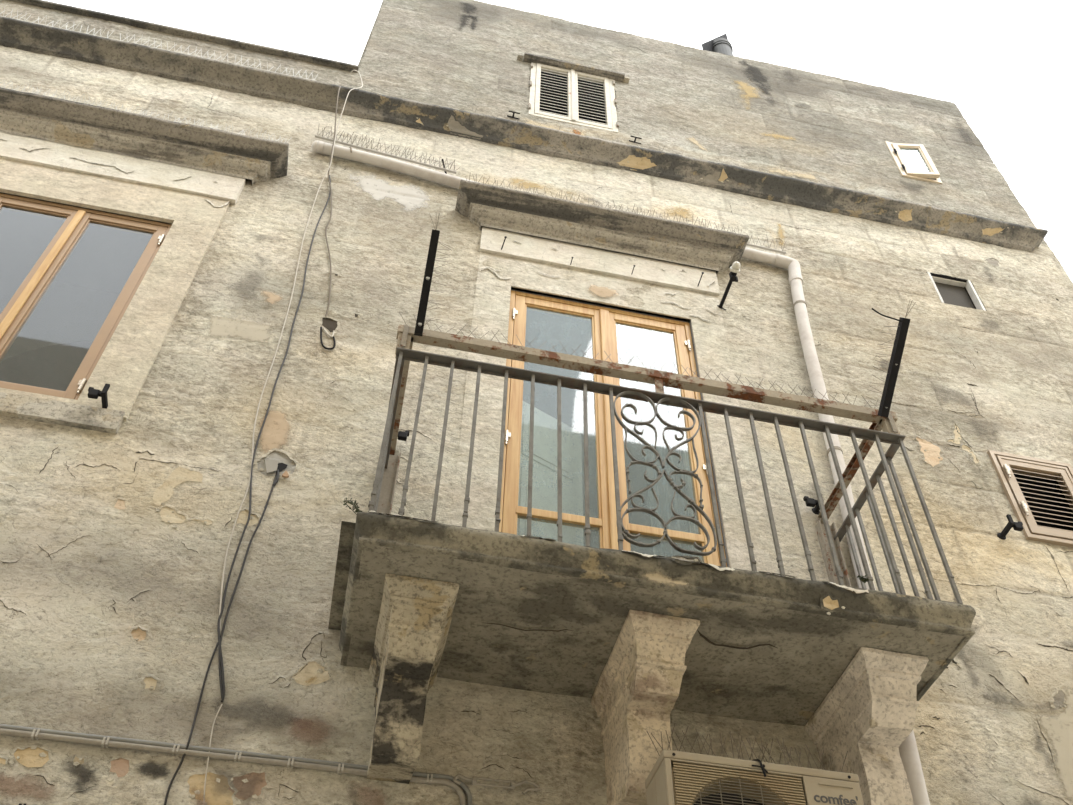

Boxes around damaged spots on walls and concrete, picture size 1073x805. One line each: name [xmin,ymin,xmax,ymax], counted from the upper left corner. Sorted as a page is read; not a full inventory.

leakage [461,3,477,29]
flaking render [446,112,485,141]
flaking render [615,150,658,173]
flaking render [695,167,729,187]
flaking render [914,423,981,468]
crack [0,446,222,494]
crack [921,544,1073,616]
crack [1037,642,1073,651]
flaking render [287,657,336,690]
crack [917,645,1071,805]
leakage [66,762,94,791]
leakage [139,761,168,777]